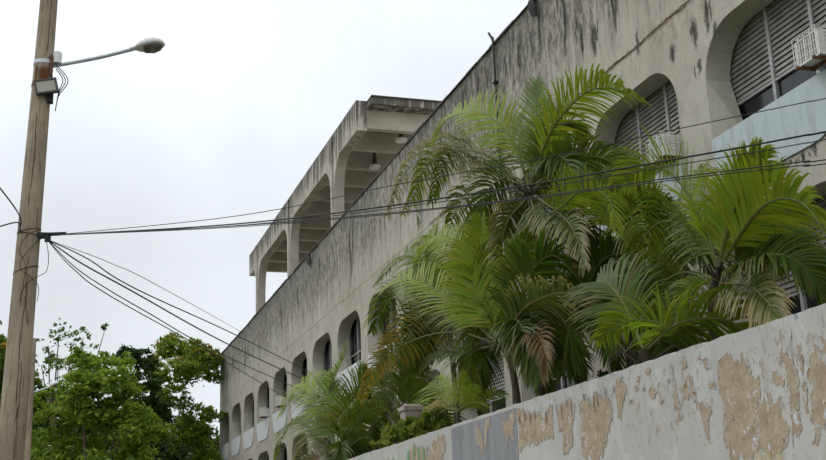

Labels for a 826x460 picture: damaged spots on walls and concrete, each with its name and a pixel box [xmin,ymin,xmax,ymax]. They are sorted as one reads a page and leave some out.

water stain [503,19,541,74]
water stain [557,0,598,55]
water stain [689,0,720,43]
peeling [501,367,662,460]
peeling [666,359,712,444]
peeling [708,339,826,460]
peeling [410,434,446,460]